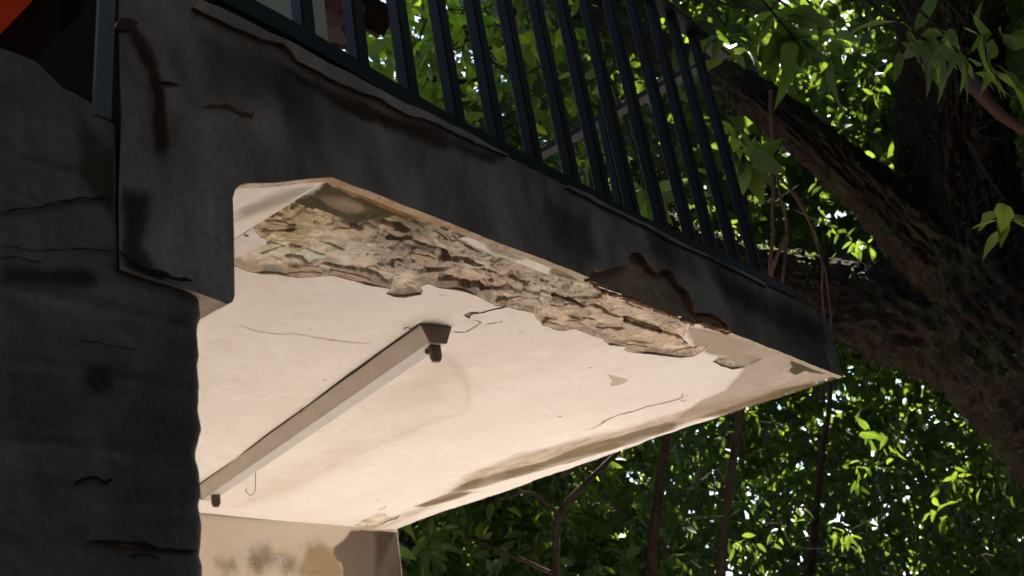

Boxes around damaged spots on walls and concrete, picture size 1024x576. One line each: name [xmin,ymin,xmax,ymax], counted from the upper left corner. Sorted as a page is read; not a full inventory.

corrosion [132,29,169,151]
crack [190,0,508,157]
crack [0,195,117,217]
spalling [234,202,727,357]
crack [235,321,377,345]
crack [455,307,523,335]
spalling [714,356,761,368]
leakage [418,328,833,507]
crack [588,394,688,430]
crack [73,476,114,485]
crack [85,540,198,559]